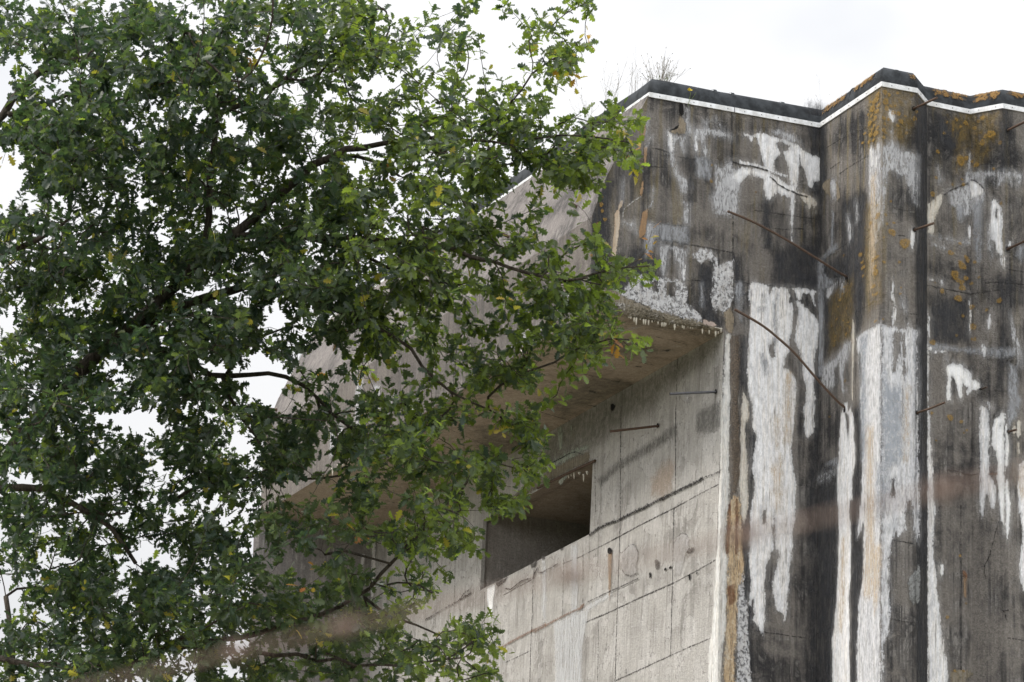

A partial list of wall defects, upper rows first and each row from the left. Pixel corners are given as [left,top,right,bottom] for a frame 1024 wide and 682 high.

spalling [604,288,741,496]
leakage [591,98,1024,682]
rust [723,495,744,682]